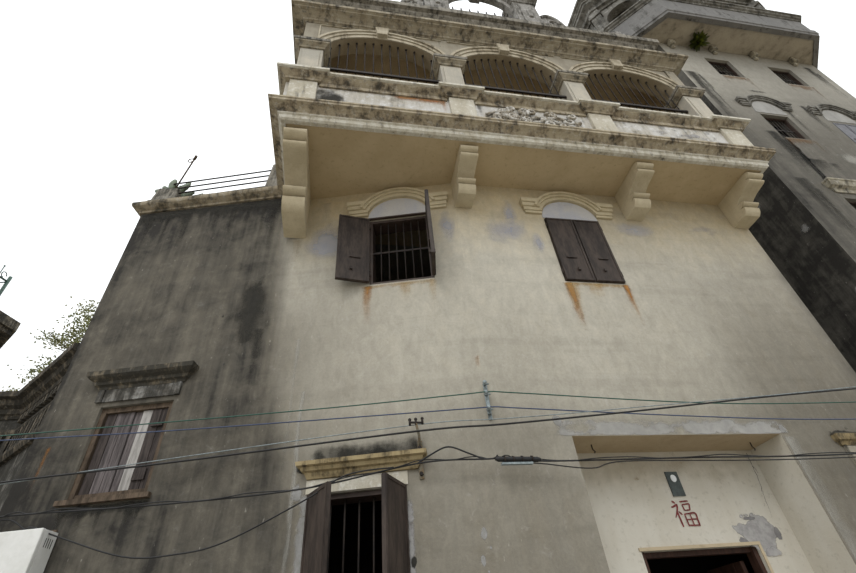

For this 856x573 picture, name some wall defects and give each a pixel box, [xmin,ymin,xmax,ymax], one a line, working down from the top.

water stain [239,281,265,350]
corrosion [566,282,579,308]
water stain [314,440,418,460]
peeling [732,513,782,556]